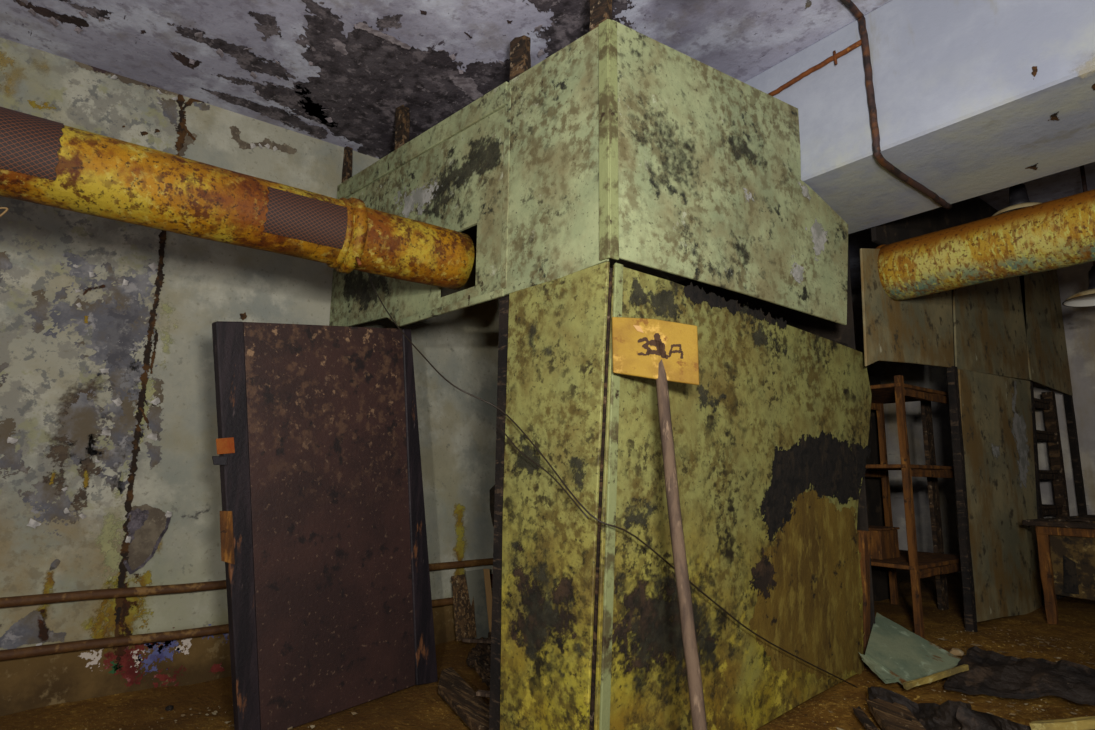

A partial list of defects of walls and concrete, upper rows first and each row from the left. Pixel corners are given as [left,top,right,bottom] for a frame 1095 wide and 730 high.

flaking render [75,61,197,156]
peeling [167,0,510,159]
peeling [0,251,13,287]
peeling [24,242,177,495]
peeling [0,418,86,536]
flaking render [123,504,209,574]